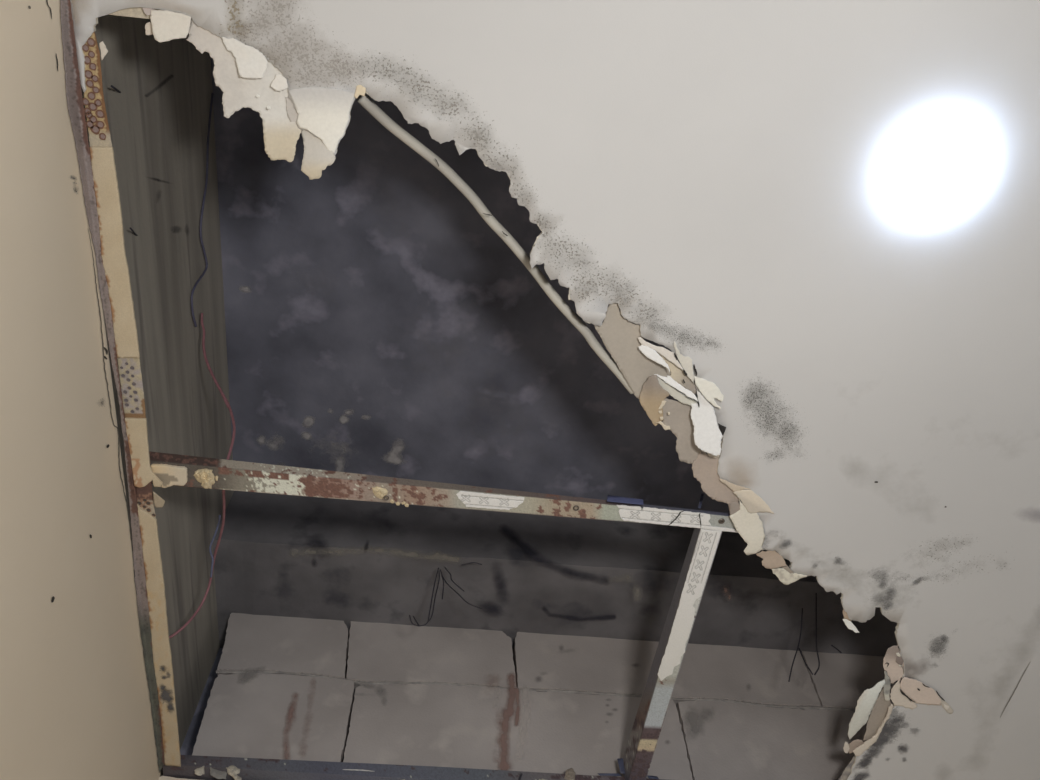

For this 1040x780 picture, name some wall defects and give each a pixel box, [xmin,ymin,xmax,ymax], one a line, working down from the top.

damp [220,0,251,35]
damp [359,51,718,350]
damp [386,443,403,464]
damp [738,380,803,461]
peeling [843,609,860,633]
corrosion [499,674,527,770]
damp [854,712,918,780]